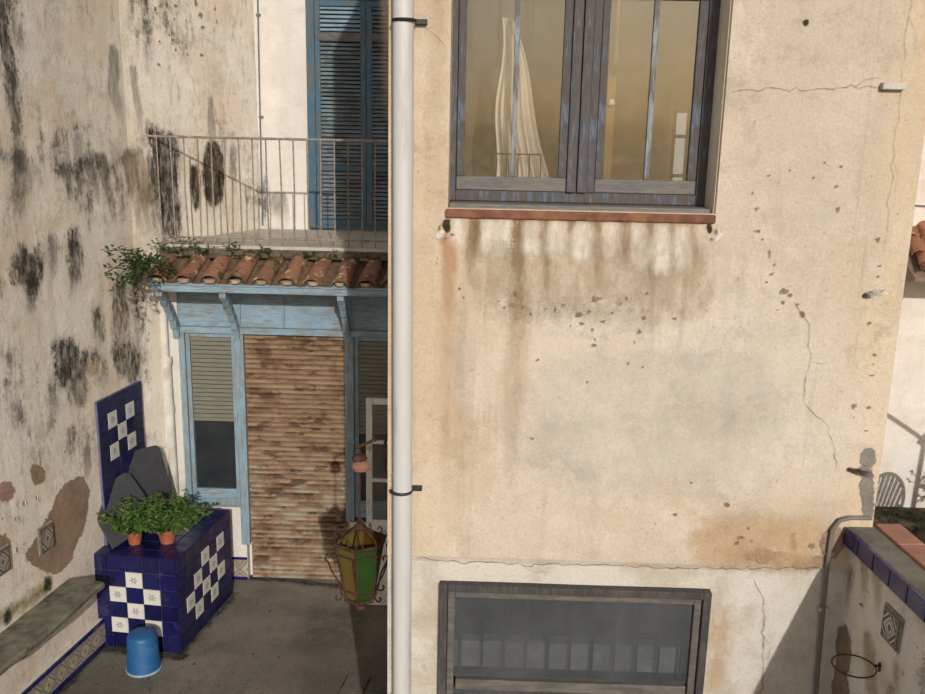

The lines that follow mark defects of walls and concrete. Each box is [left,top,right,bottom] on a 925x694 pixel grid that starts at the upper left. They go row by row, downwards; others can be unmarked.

damp [0,0,23,134]
damp [146,124,232,240]
damp [9,239,55,303]
damp [65,230,83,280]
damp [112,270,145,330]
damp [452,218,686,273]
damp [49,336,141,404]
peeling [0,464,45,506]
peeling [0,476,90,575]
peeling [831,624,851,694]